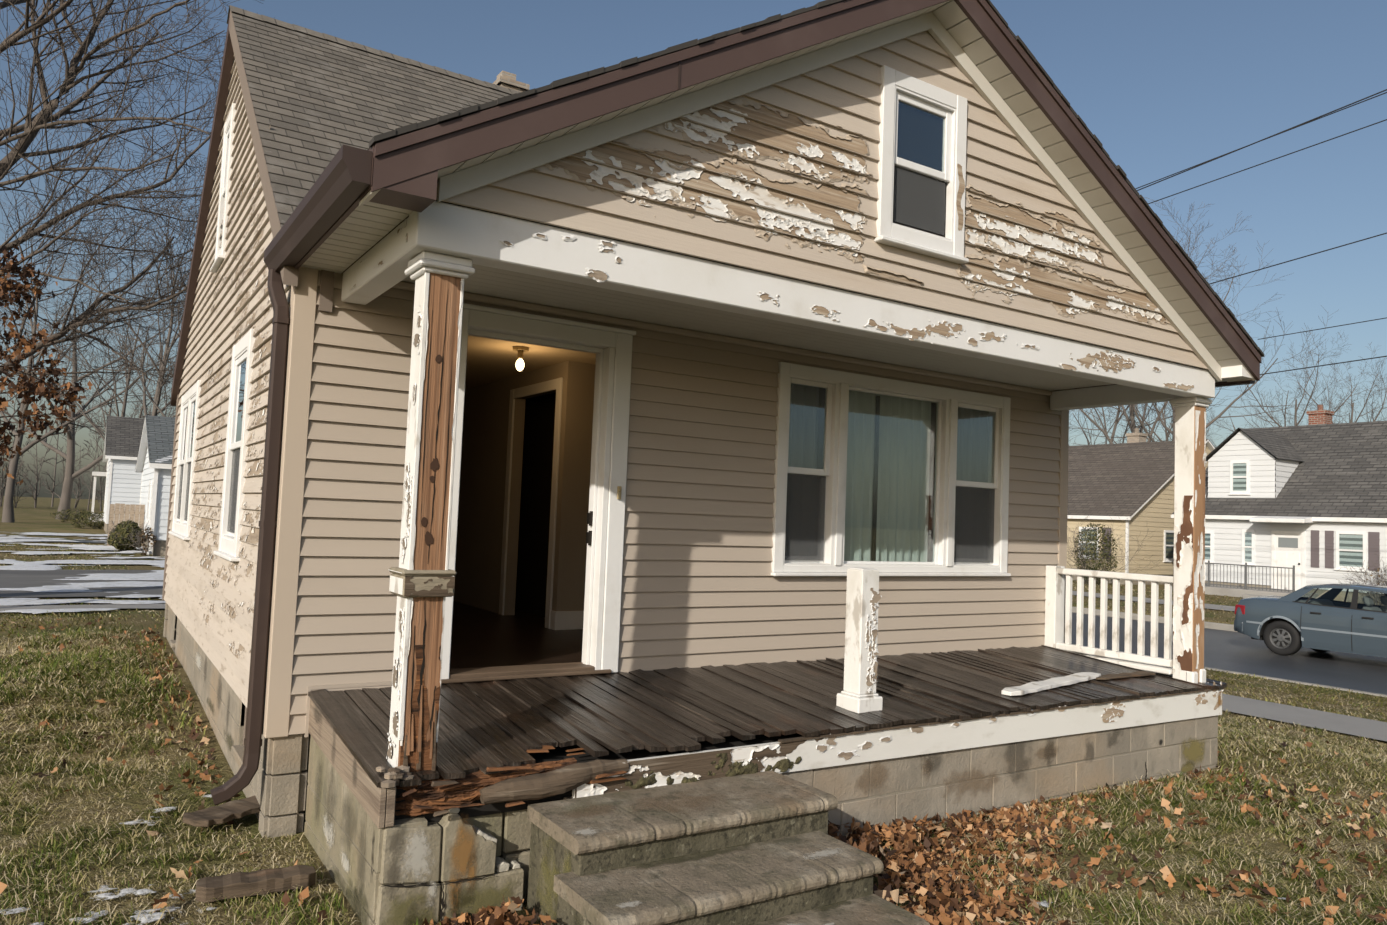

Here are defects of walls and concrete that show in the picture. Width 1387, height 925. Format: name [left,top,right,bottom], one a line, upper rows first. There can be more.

peeling [188,168,273,629]
peeling [401,311,428,564]
peeling [452,281,463,445]
peeling [532,99,924,288]
peeling [810,305,841,322]
peeling [956,164,1172,325]
peeling [1172,410,1206,672]
peeling [386,597,413,759]
peeling [575,736,892,798]
peeling [865,587,882,697]
peeling [1101,702,1126,723]
leakage [406,835,435,925]